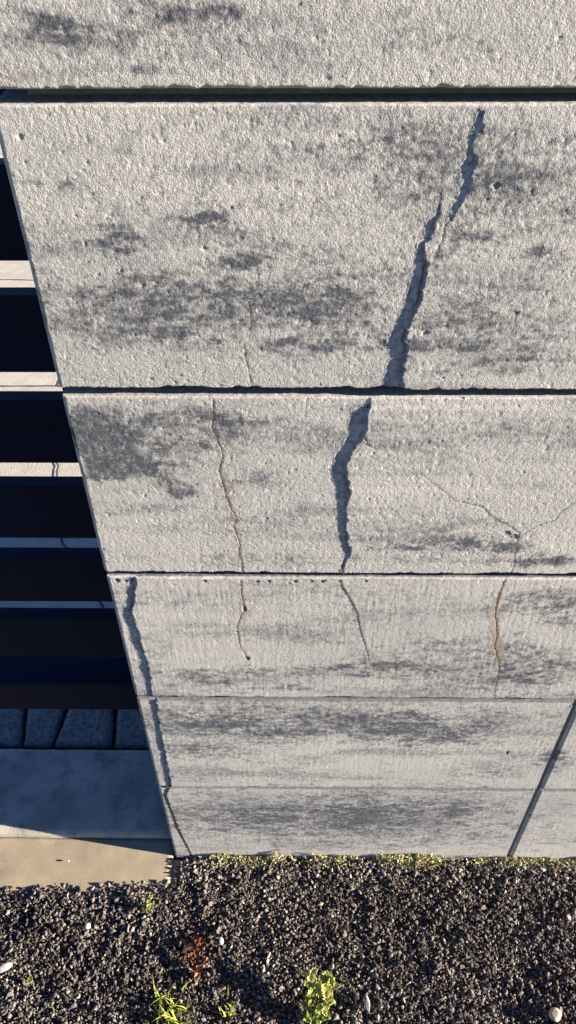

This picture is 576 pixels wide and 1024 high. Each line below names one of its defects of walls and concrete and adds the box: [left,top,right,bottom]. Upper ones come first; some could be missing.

leakage [414,72,444,88]
leakage [528,74,576,88]
leakage [28,104,576,514]
crack [329,109,485,660]
crack [99,576,192,856]
crack [212,400,249,661]
rust [210,421,257,643]
rust [485,595,504,662]
crack [419,472,575,698]